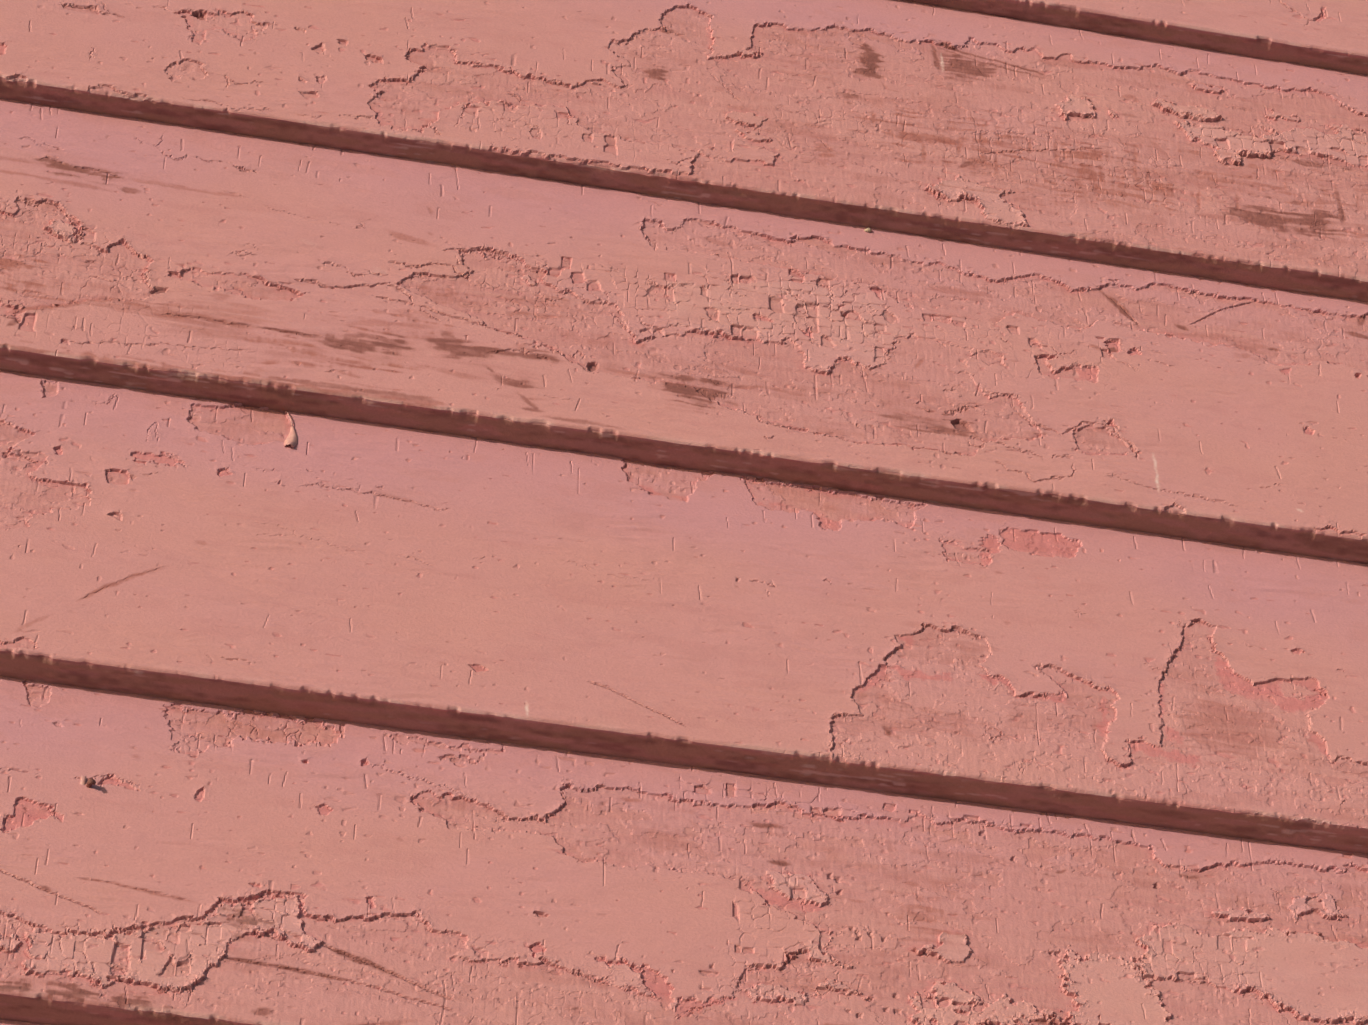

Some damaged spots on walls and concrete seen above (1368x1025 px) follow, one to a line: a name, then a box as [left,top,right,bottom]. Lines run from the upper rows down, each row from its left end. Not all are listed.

peeling [364,3,1368,282]
peeling [0,195,307,314]
peeling [0,340,445,410]
peeling [367,217,1368,455]
peeling [0,417,93,530]
peeling [106,421,191,485]
peeling [1315,525,1367,540]
peeling [24,680,53,708]
peeling [163,703,348,764]
peeling [388,732,508,766]
peeling [828,615,1368,829]
peeling [0,757,1368,1025]